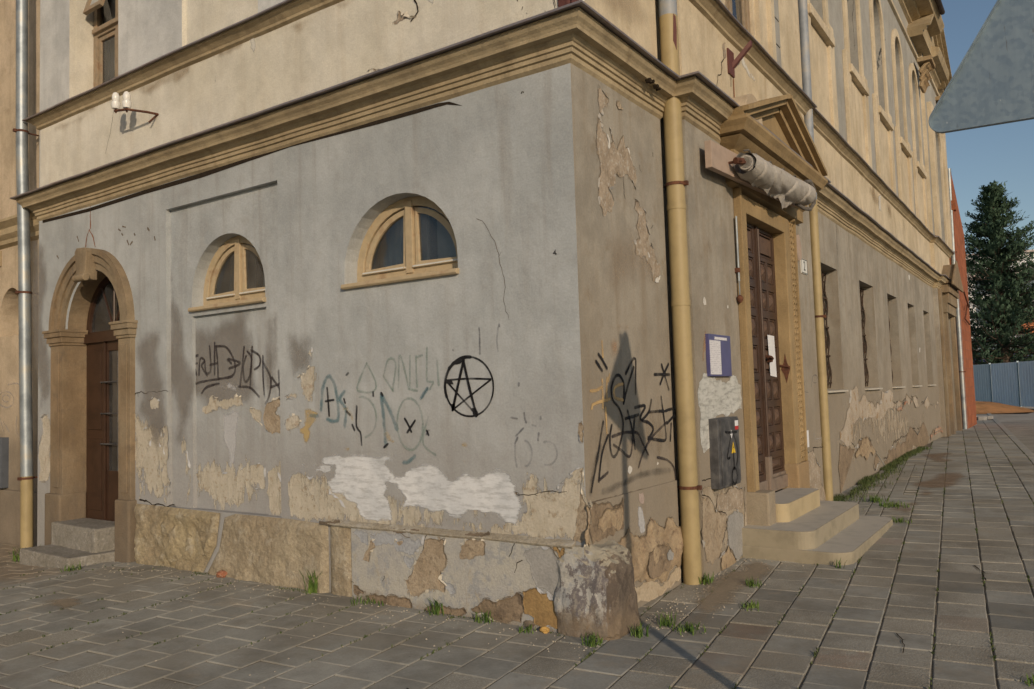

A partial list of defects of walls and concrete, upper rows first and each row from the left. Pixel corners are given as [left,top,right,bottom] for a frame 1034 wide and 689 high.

crack [476,218,509,318]
peeling [135,397,170,503]
spalling [202,347,317,434]
spalling [838,385,943,494]
peeling [181,437,683,629]
spalling [700,484,747,571]